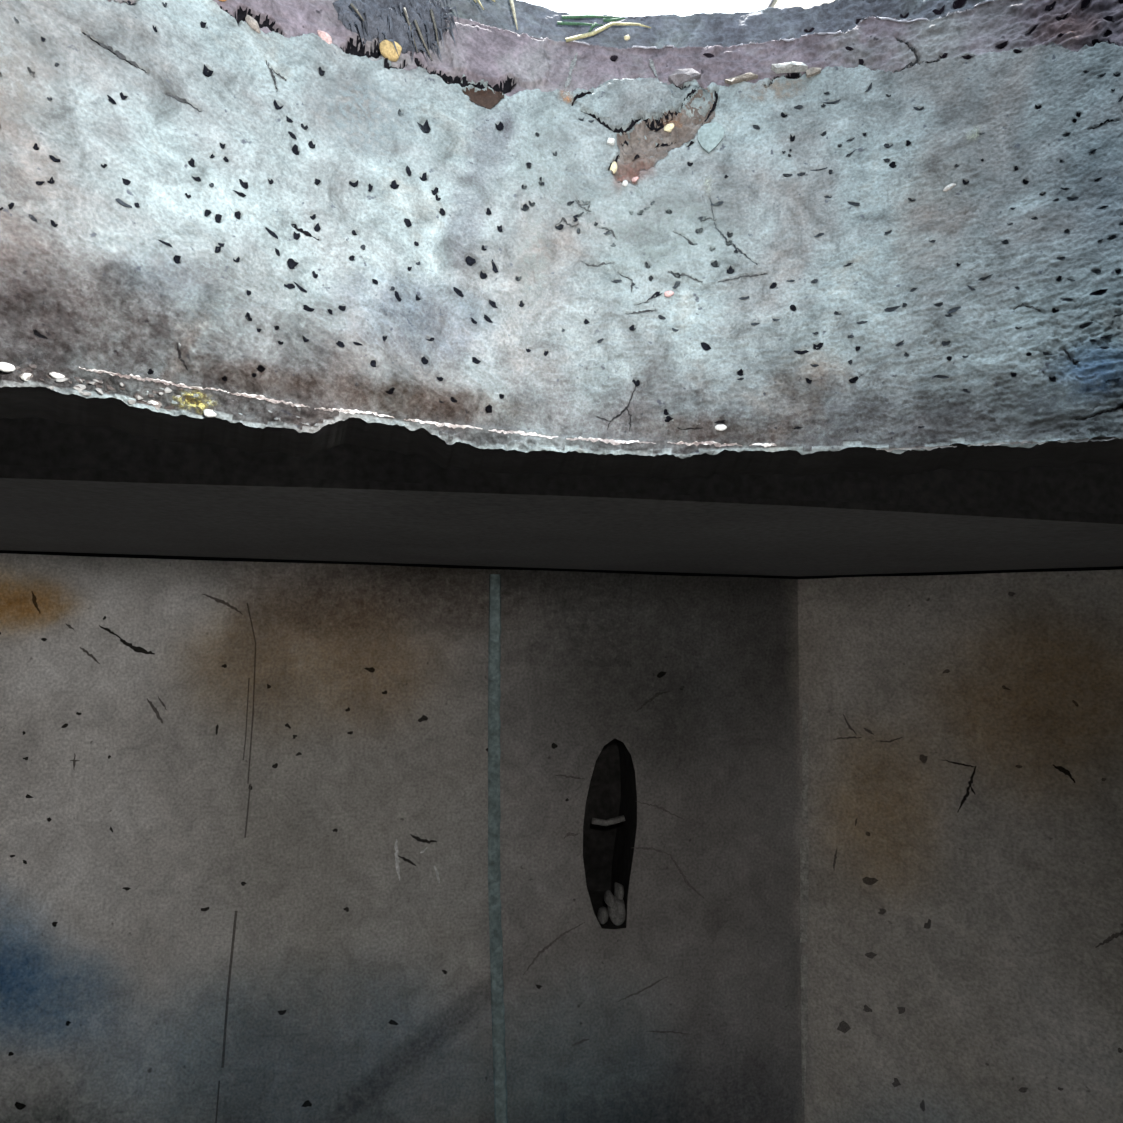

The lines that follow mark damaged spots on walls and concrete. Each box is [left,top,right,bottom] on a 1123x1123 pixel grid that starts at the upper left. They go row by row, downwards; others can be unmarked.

crack [82,32,148,73]
spalling [220,6,284,36]
crack [166,93,199,111]
spalling [611,68,725,185]
crack [555,200,656,314]
crack [668,198,767,282]